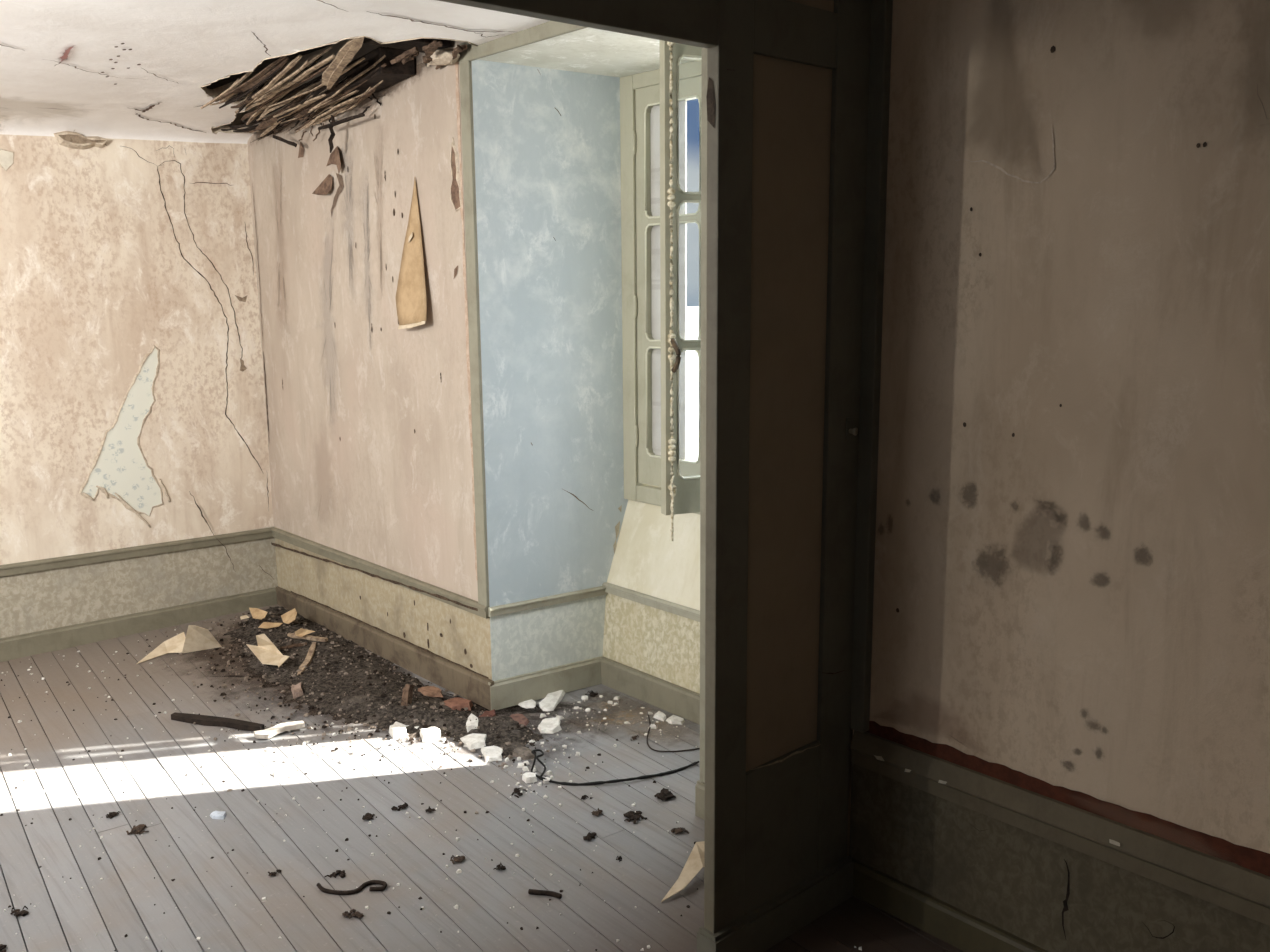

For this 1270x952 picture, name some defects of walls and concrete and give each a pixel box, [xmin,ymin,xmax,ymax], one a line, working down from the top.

spalling [201,36,477,133]
peeling [312,174,333,195]
crack [0,44,269,510]
spalling [79,345,170,528]
crack [189,491,489,679]